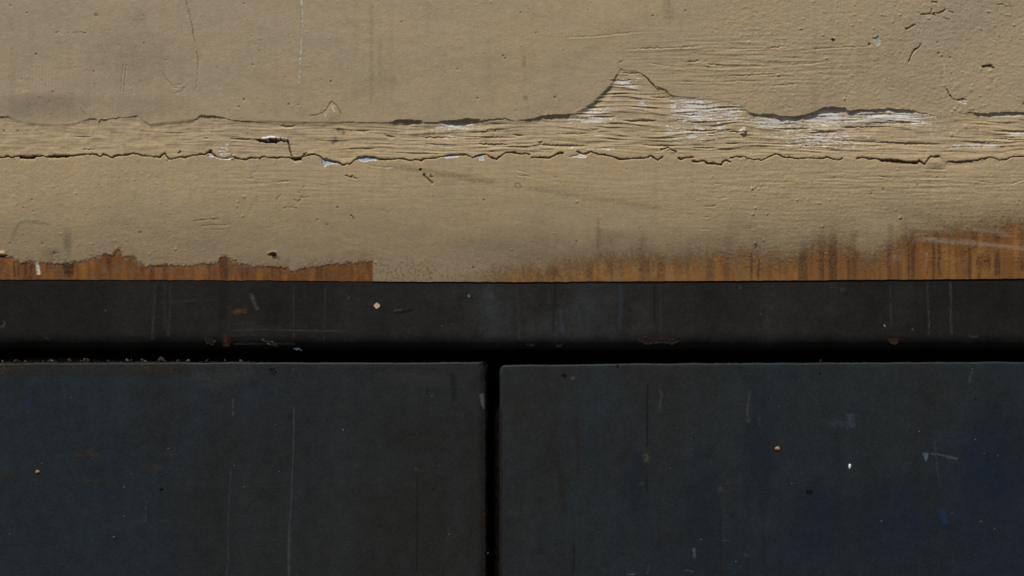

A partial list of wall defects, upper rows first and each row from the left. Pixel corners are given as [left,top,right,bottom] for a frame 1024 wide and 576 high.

peeling [0,69,1024,185]
crack [0,140,1024,167]
corrosion [493,223,1024,282]